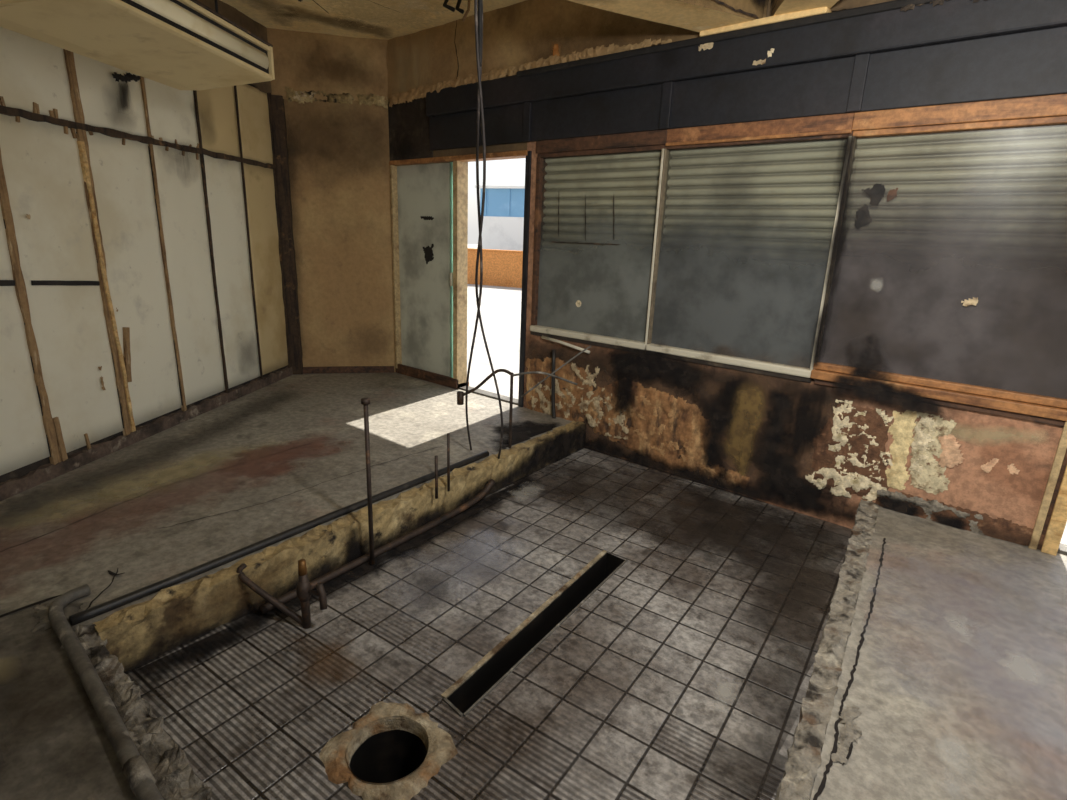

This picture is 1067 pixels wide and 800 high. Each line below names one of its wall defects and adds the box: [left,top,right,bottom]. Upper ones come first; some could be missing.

leakage [120,83,129,108]
leakage [615,375,635,415]
leakage [722,377,764,476]
peeling [805,399,1045,547]
spalling [127,357,852,800]
crack [813,538,886,800]